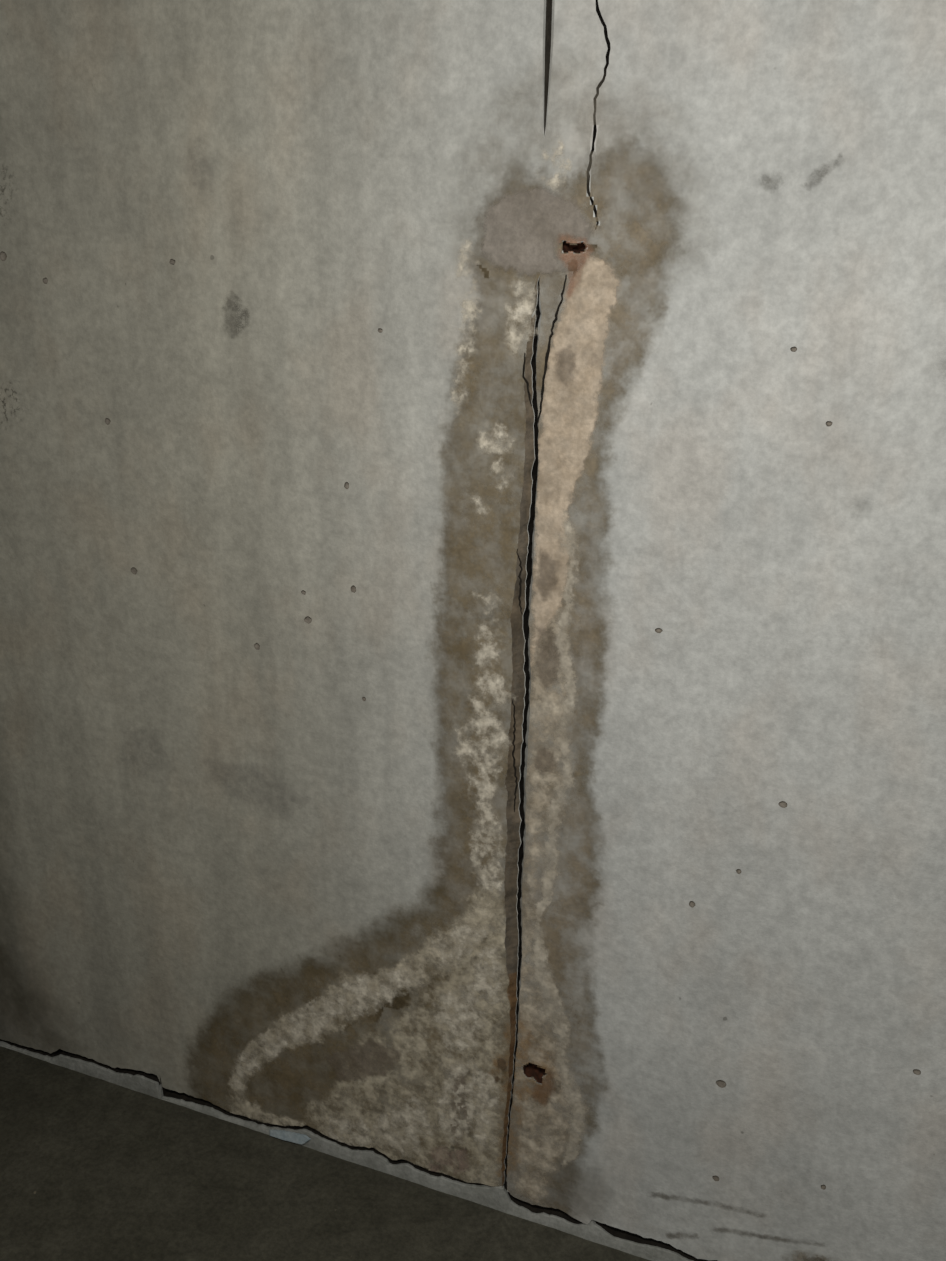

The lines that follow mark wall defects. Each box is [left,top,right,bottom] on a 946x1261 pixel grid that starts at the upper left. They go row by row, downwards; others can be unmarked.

crack [586,0,611,225]
crack [0,275,718,1261]
water stain [189,158,675,1214]
corrosion [494,973,551,1185]